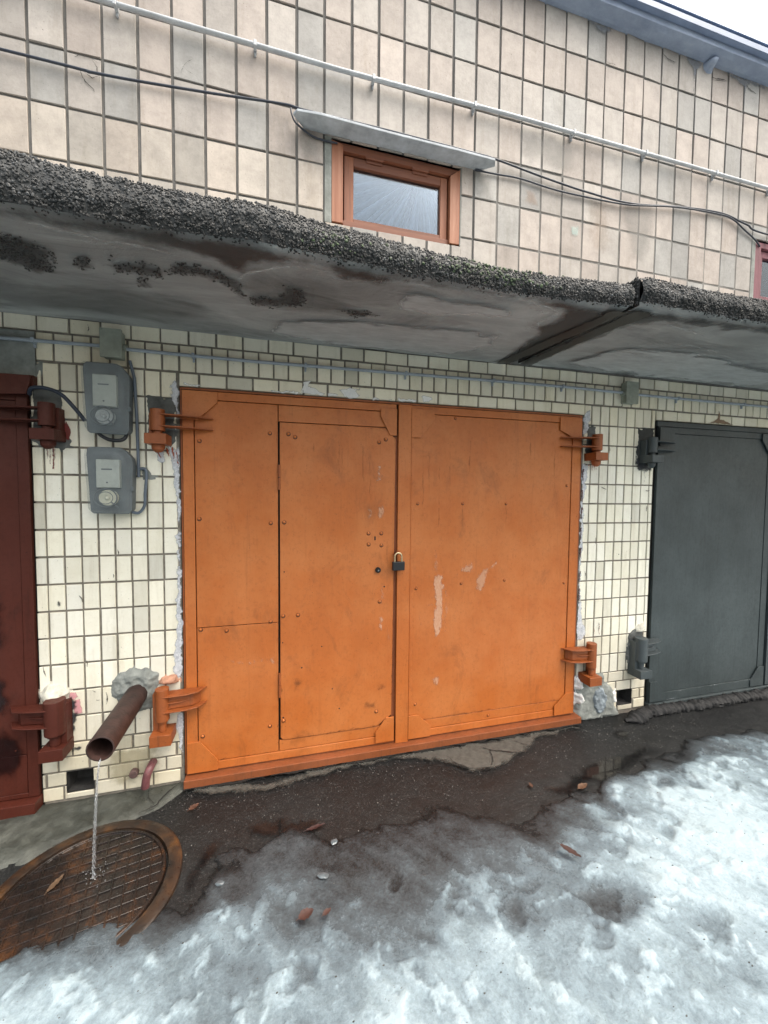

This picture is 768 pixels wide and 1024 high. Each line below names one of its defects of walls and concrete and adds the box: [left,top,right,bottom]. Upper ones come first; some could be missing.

leakage [8,211,291,278]
leakage [333,267,388,283]
leakage [497,304,768,365]
peeling [170,381,200,414]
peeling [271,381,359,399]
peeling [157,446,183,677]
peeling [577,464,596,640]
peeling [176,713,184,750]